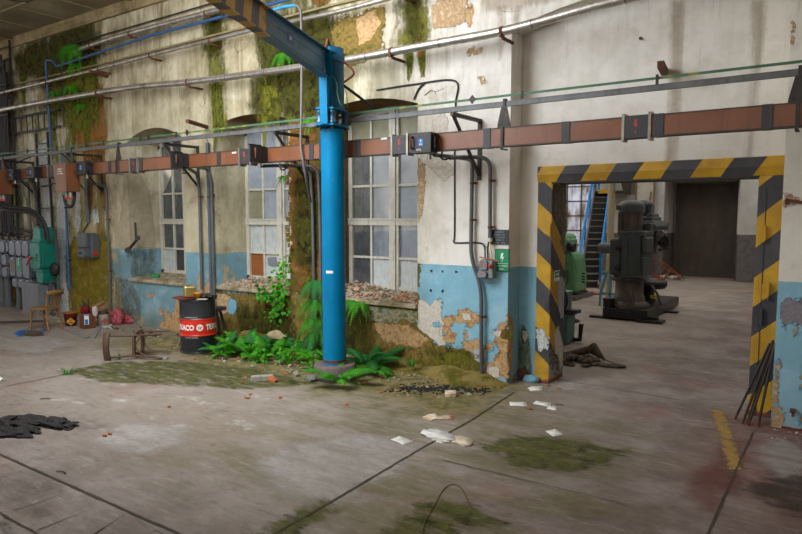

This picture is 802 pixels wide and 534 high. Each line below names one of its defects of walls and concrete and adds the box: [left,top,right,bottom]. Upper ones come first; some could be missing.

spalling [330,6,386,67]
water stain [405,50,426,81]
spalling [430,0,475,29]
water stain [211,84,224,152]
spalling [158,294,180,332]
spalling [346,276,565,379]
peeling [780,297,802,338]
spalling [771,359,802,428]